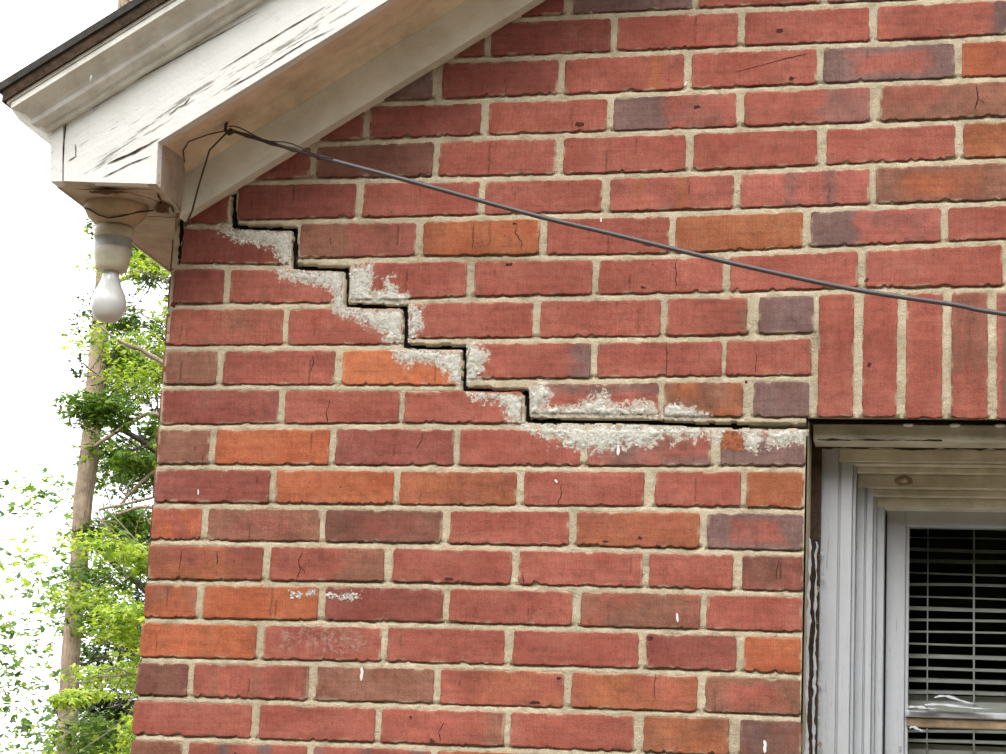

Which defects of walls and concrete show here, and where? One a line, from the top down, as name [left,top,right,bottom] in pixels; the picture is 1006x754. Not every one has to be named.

crack [232,193,748,430]
peeling [804,432,825,754]